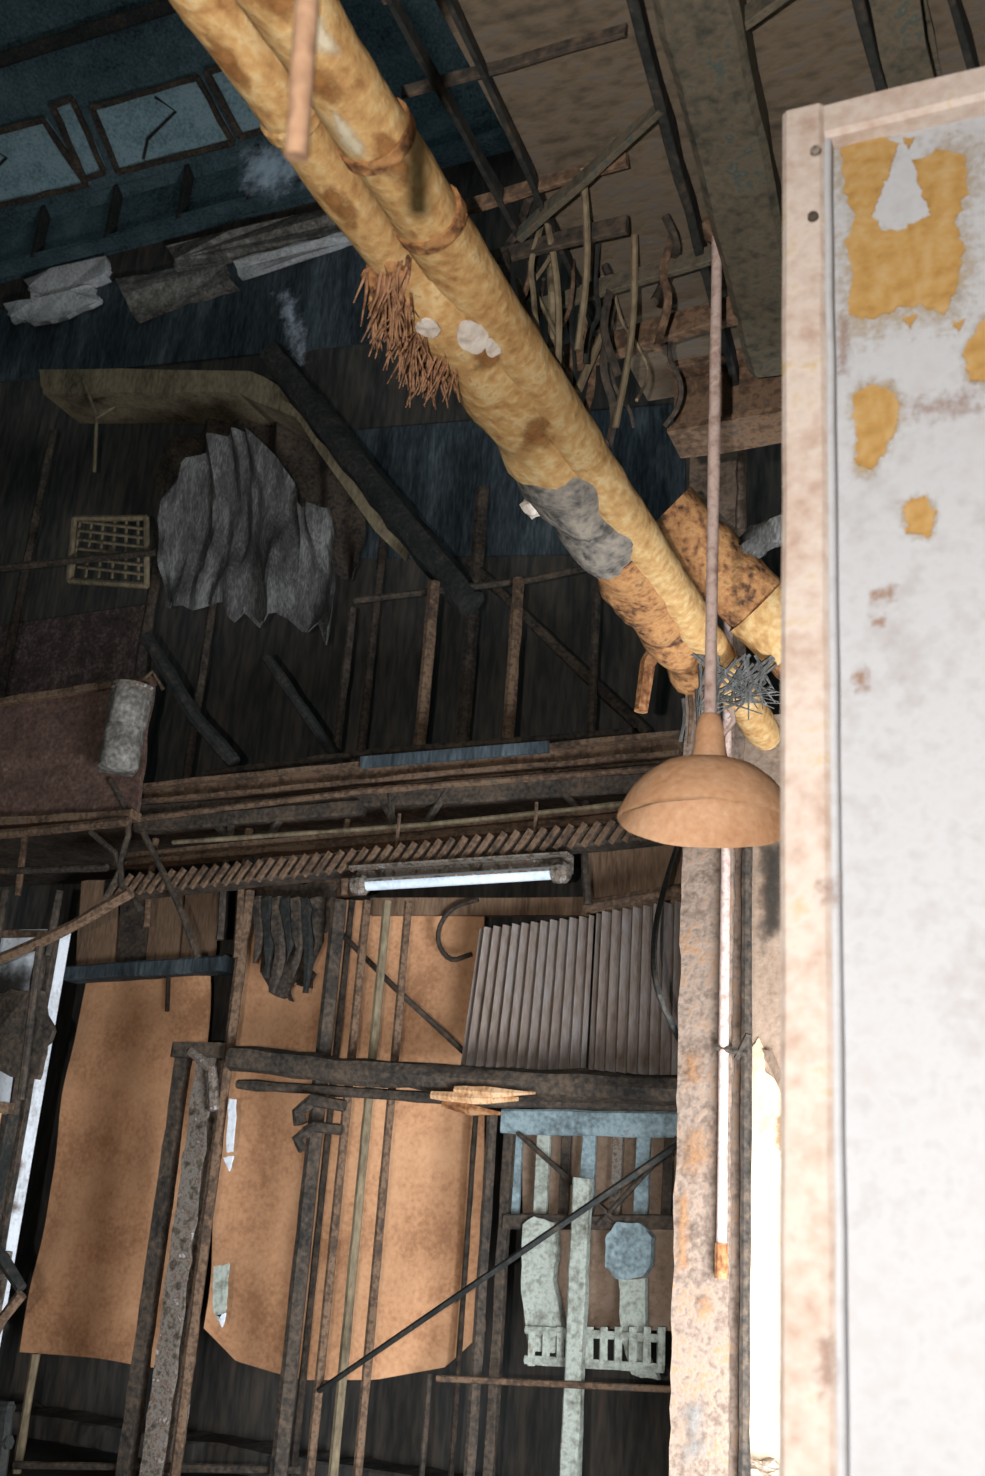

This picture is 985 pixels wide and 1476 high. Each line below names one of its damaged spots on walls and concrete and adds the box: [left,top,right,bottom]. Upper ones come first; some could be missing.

peeling [837,137,985,383]
peeling [851,380,902,473]
peeling [901,495,938,538]